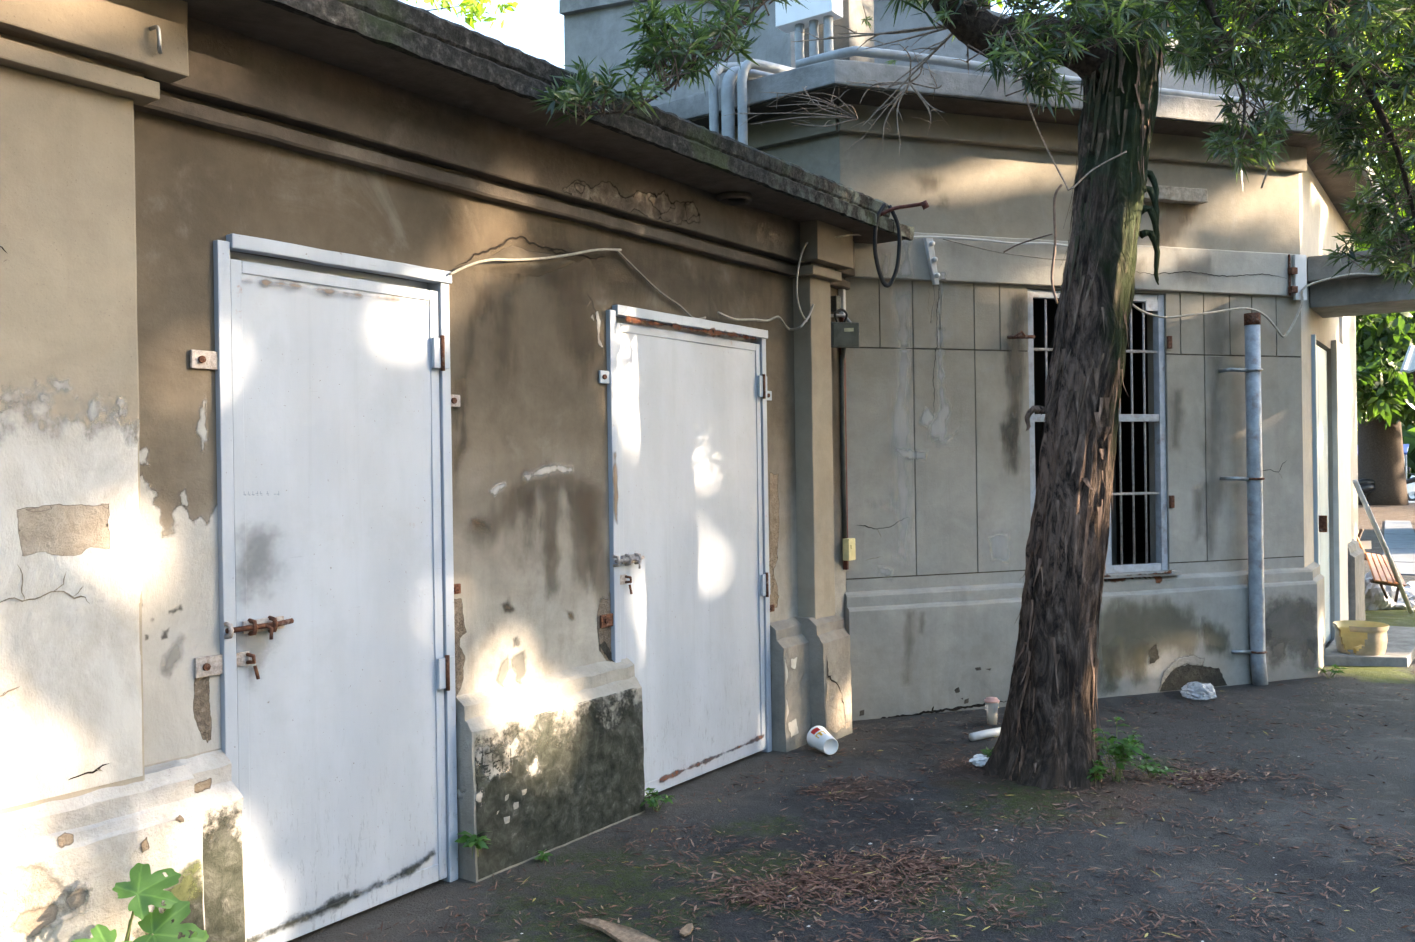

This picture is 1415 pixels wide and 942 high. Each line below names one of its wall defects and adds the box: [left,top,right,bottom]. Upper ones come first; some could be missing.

corrosion [626,315,756,340]
crack [1,566,90,604]
peeling [0,380,222,809]
leakage [497,637,526,687]
peeling [785,650,799,738]
flaking render [825,677,864,733]
leakage [1098,604,1227,687]
leakage [1265,598,1318,669]
mould [475,689,645,880]
corrosion [659,735,764,783]
flaking render [58,832,74,848]
mould [158,808,246,942]